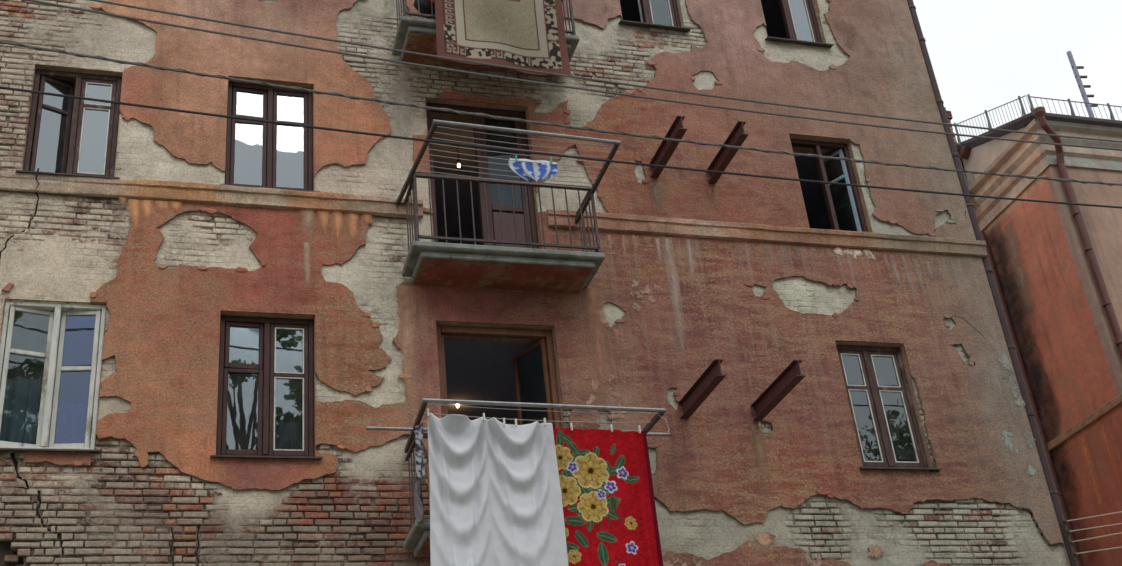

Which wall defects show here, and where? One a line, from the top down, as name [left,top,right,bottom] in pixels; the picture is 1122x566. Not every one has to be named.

flaking render [0,0,157,172]
flaking render [690,72,723,90]
flaking render [114,112,225,184]
crack [0,168,40,259]
flaking render [0,190,131,341]
flaking render [154,208,266,272]
flaking render [313,0,706,410]
flaking render [745,277,860,318]
leakage [990,224,1075,506]
crack [11,453,64,557]
flaking render [0,436,431,566]
flaking render [655,489,1068,566]